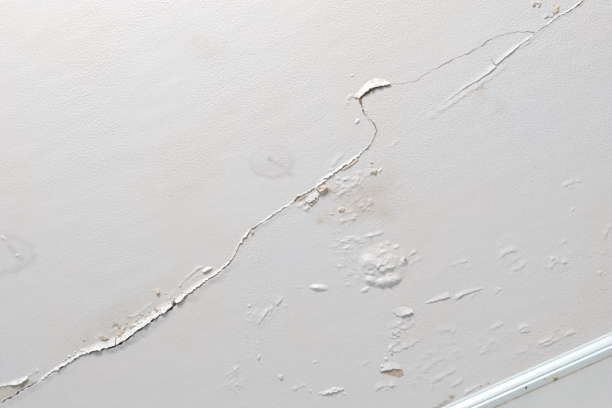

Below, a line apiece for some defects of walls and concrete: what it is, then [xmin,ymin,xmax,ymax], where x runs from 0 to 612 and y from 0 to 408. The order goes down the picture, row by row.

crack [391,0,589,123]
peeling [341,78,391,125]
crack [1,97,378,408]
peeling [376,307,425,378]
peeling [0,367,39,402]